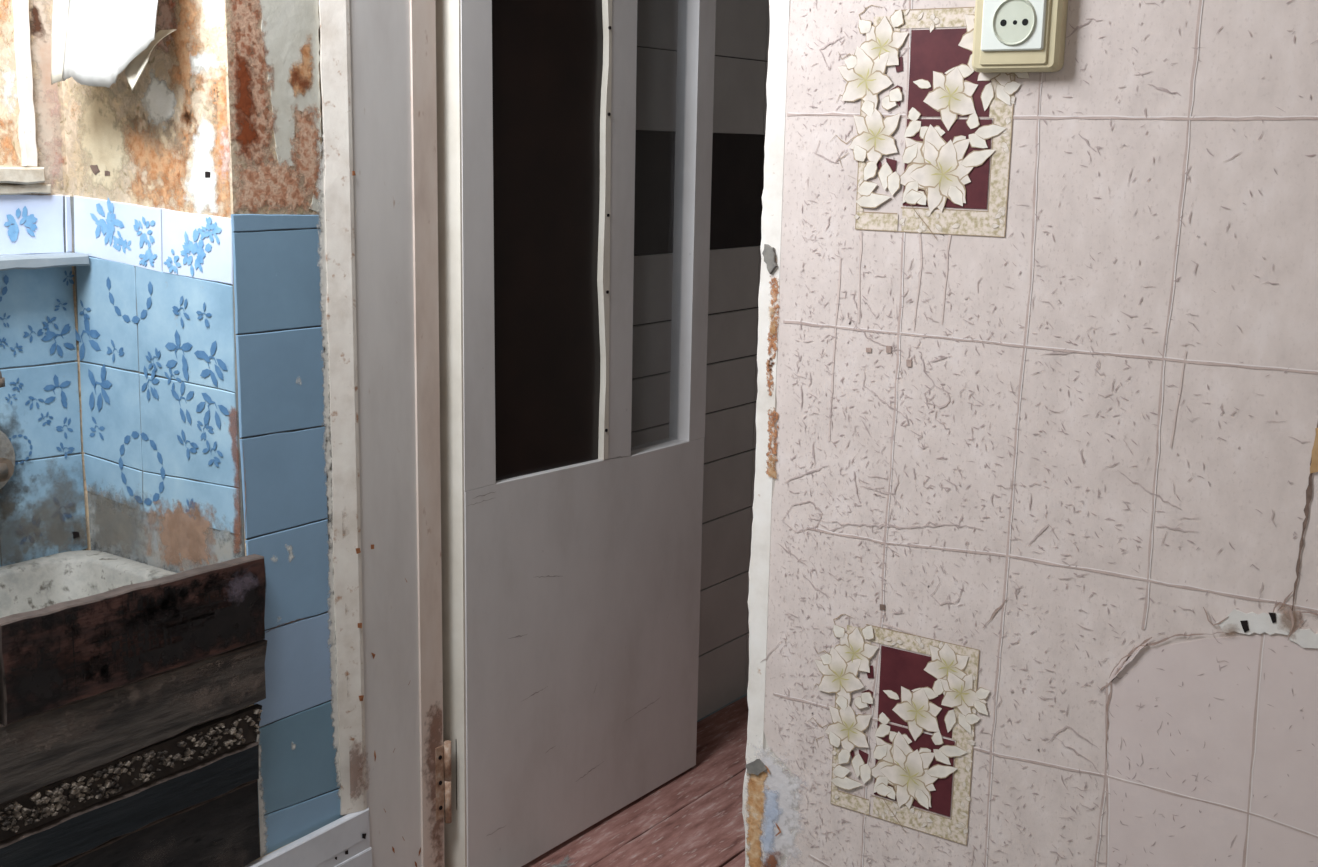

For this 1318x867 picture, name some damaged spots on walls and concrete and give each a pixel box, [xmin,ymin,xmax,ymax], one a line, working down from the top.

peeling [0,71,20,165]
flaking render [30,0,322,217]
crack [1278,460,1313,611]
peeling [1216,609,1291,635]
corrosion [349,745,364,799]
corrosion [427,706,443,863]
spalling [745,750,801,867]